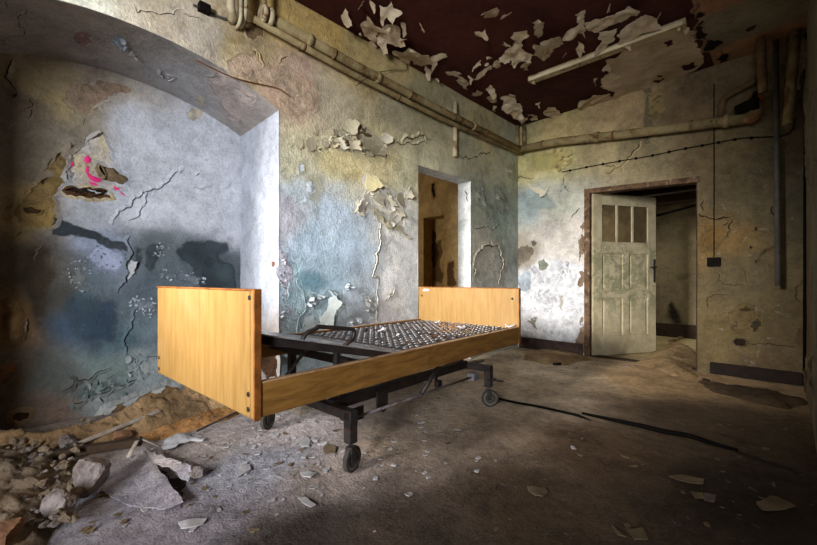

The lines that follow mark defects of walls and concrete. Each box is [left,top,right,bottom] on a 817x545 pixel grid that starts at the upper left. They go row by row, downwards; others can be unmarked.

peeling [341,1,732,124]
flaking render [7,129,134,235]
water stain [52,218,162,270]
crack [108,166,232,293]
water stain [176,241,236,288]
peeling [271,250,294,330]
flaking render [202,18,416,241]
crack [353,185,412,321]
crack [472,223,506,284]
flaking render [505,220,584,355]